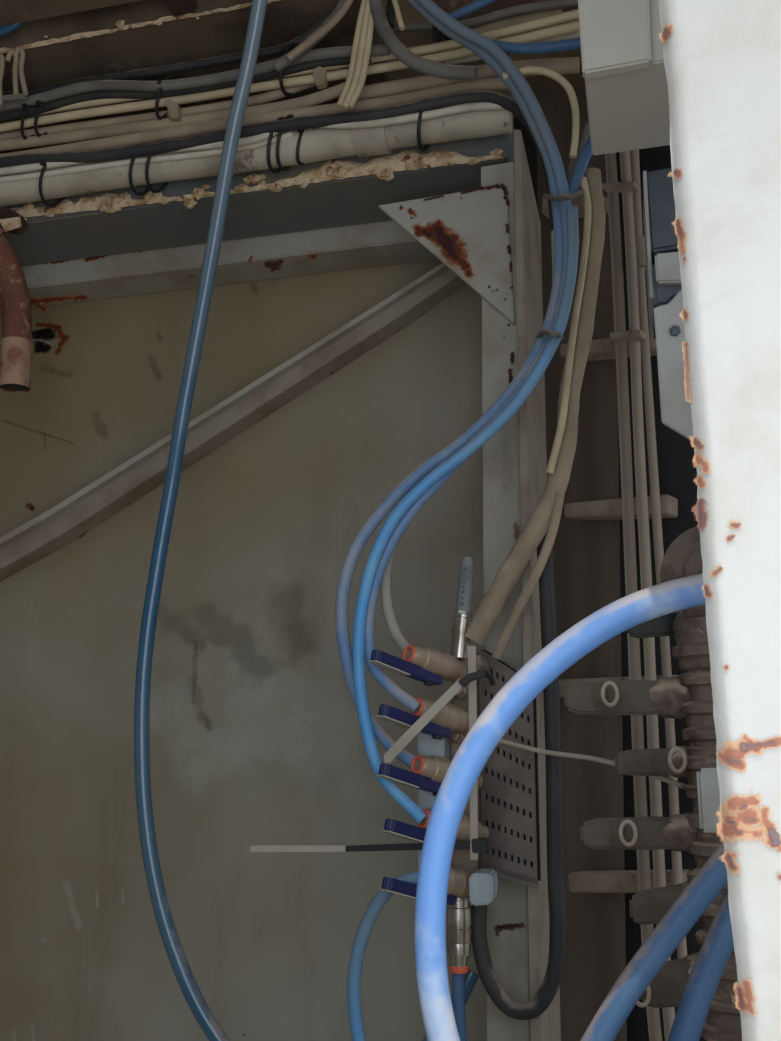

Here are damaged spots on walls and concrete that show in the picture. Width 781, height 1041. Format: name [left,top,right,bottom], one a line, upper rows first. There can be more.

corrosion [230,148,503,194]
corrosion [0,184,215,235]
corrosion [399,204,473,277]
corrosion [30,293,88,355]
corrosion [691,437,711,530]
corrosion [726,520,741,542]
corrosion [702,566,723,598]
corrosion [717,734,781,772]
corrosion [717,794,781,873]